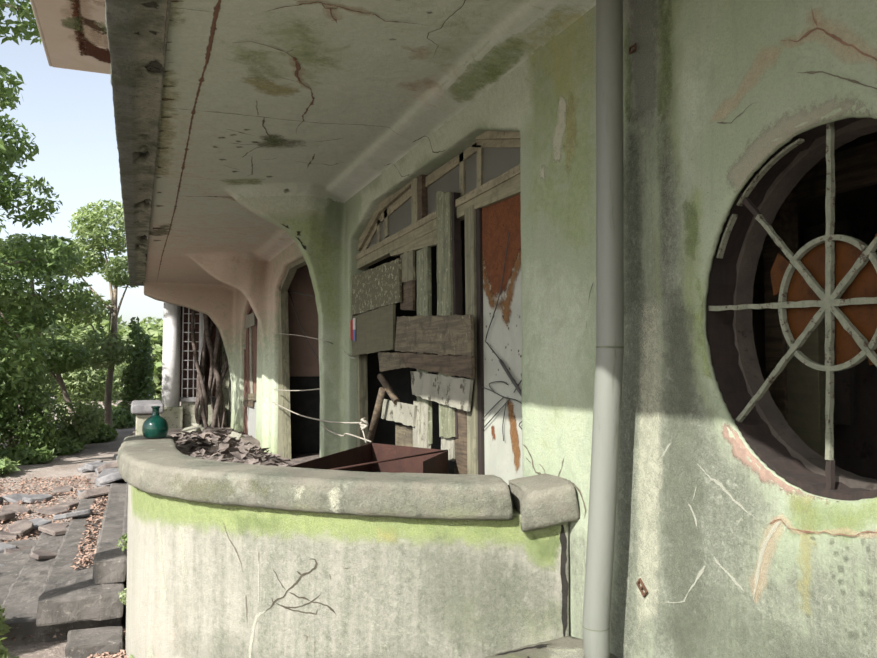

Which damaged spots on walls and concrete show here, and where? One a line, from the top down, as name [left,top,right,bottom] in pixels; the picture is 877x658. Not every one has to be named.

corrosion [70,0,111,64]
crack [269,0,466,48]
crack [781,7,877,61]
crack [799,71,877,89]
crack [157,0,394,279]
spalling [727,97,870,193]
damp [149,225,171,241]
crack [524,445,586,517]
crack [697,464,877,537]
crack [223,522,348,658]
crack [497,525,568,658]